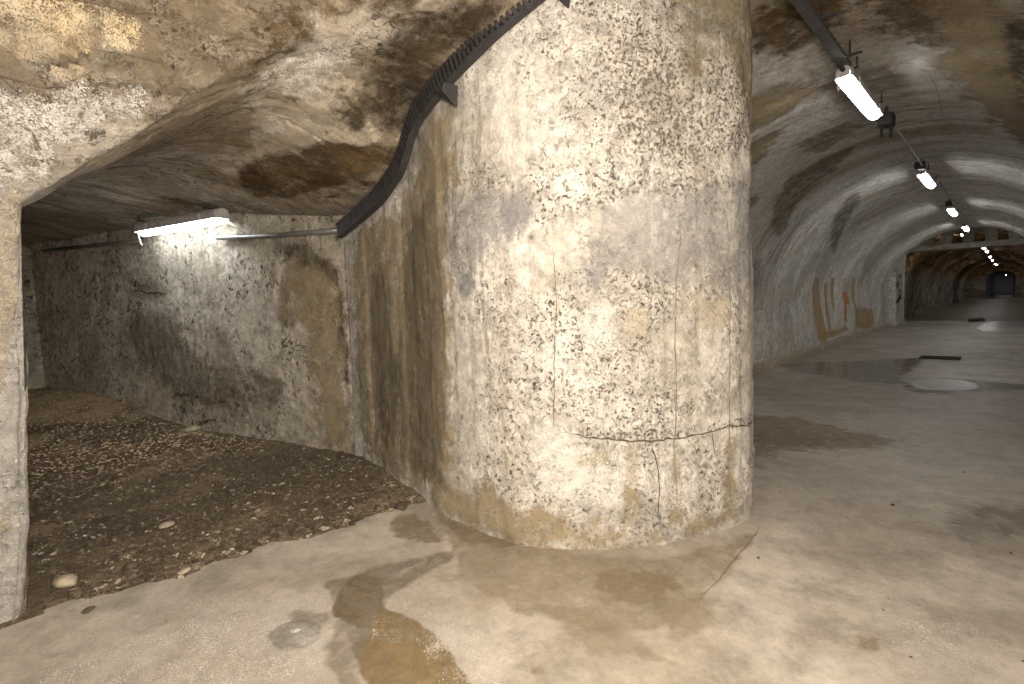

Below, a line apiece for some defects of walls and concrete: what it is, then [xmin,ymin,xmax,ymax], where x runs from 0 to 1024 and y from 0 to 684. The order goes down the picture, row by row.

leakage [234,0,500,198]
leakage [670,0,837,166]
leakage [810,0,1024,156]
leakage [771,124,864,234]
leakage [831,193,860,250]
leakage [16,105,759,684]
crack [562,422,752,512]
leakage [753,416,892,457]